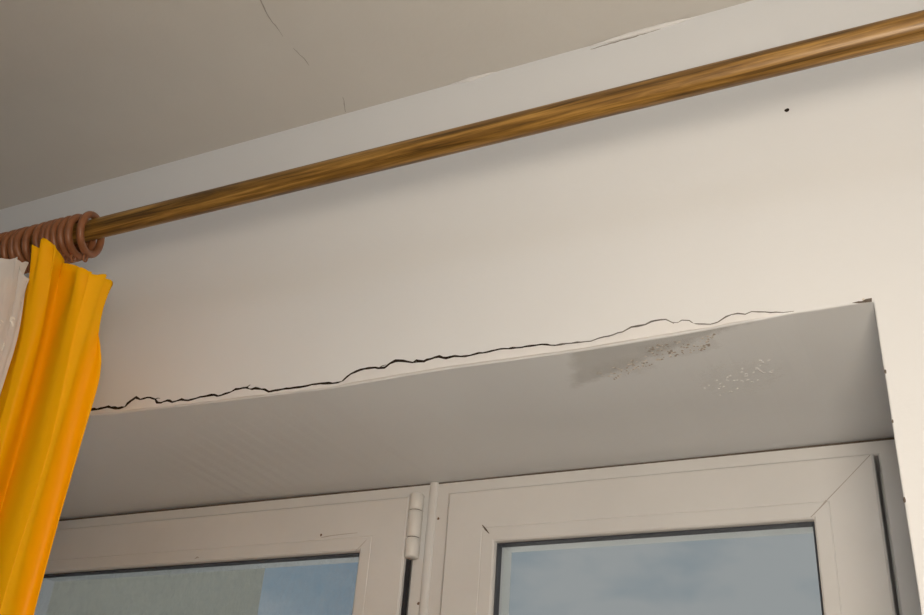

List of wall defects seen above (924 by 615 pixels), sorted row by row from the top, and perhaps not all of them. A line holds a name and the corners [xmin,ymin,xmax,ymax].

crack [91,311,793,411]